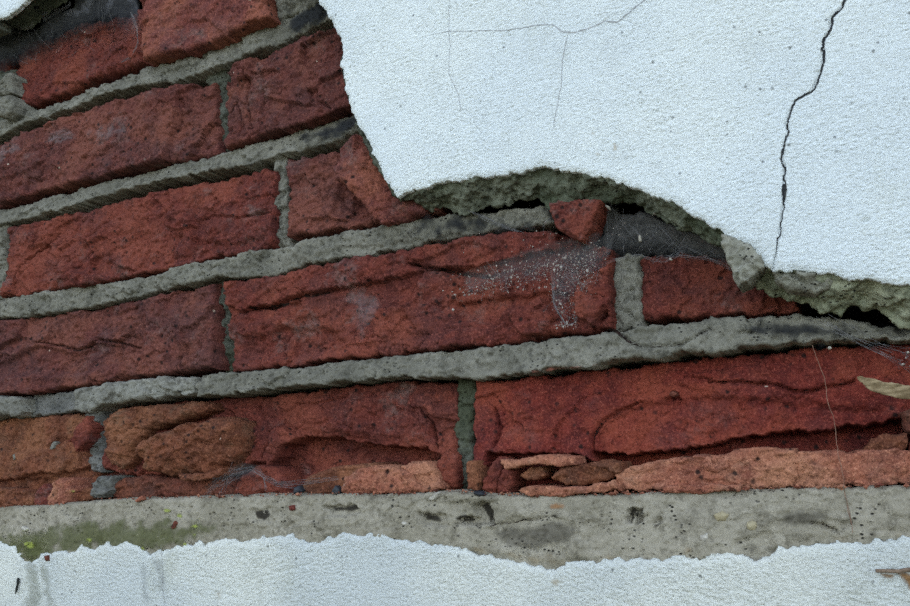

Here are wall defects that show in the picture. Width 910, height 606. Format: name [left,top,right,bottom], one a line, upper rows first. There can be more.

spalling [0,0,68,37]
spalling [340,52,910,330]
crack [774,0,846,259]
peeling [0,401,910,570]